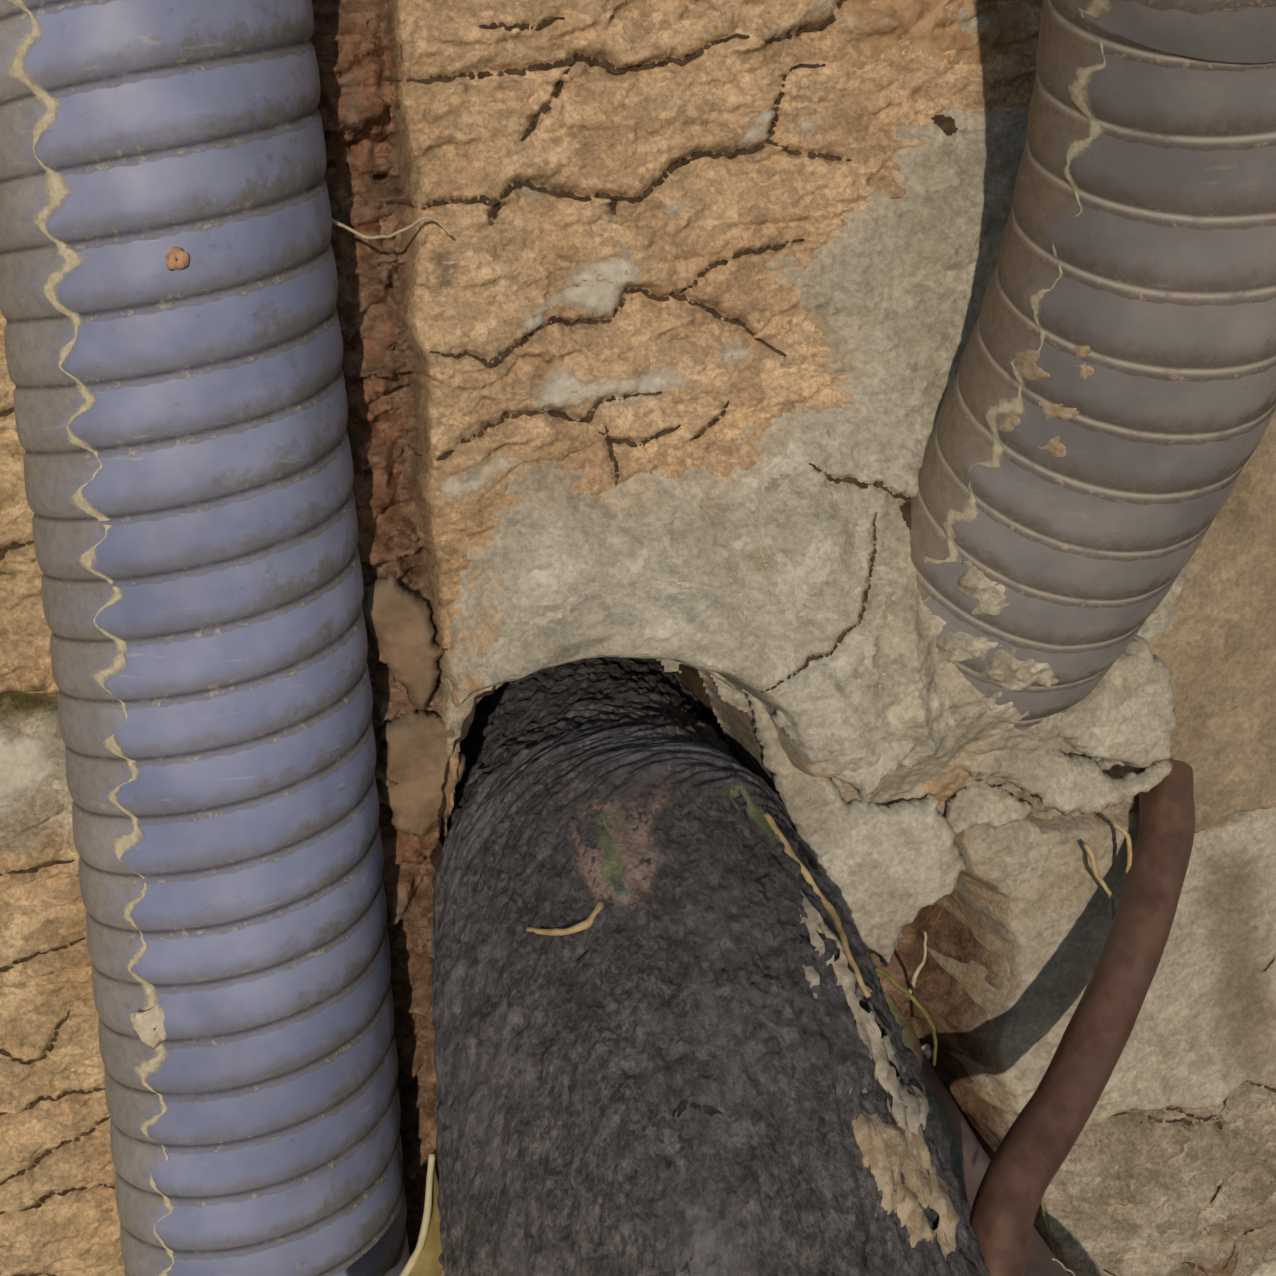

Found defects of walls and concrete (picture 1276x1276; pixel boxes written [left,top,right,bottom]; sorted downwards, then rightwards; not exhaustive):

crack [381,0,852,226]
crack [430,239,805,368]
crack [413,391,729,485]
crack [760,463,912,693]
flaking render [741,635,1177,969]
crack [1113,1081,1276,1130]
crack [1181,1229,1255,1274]